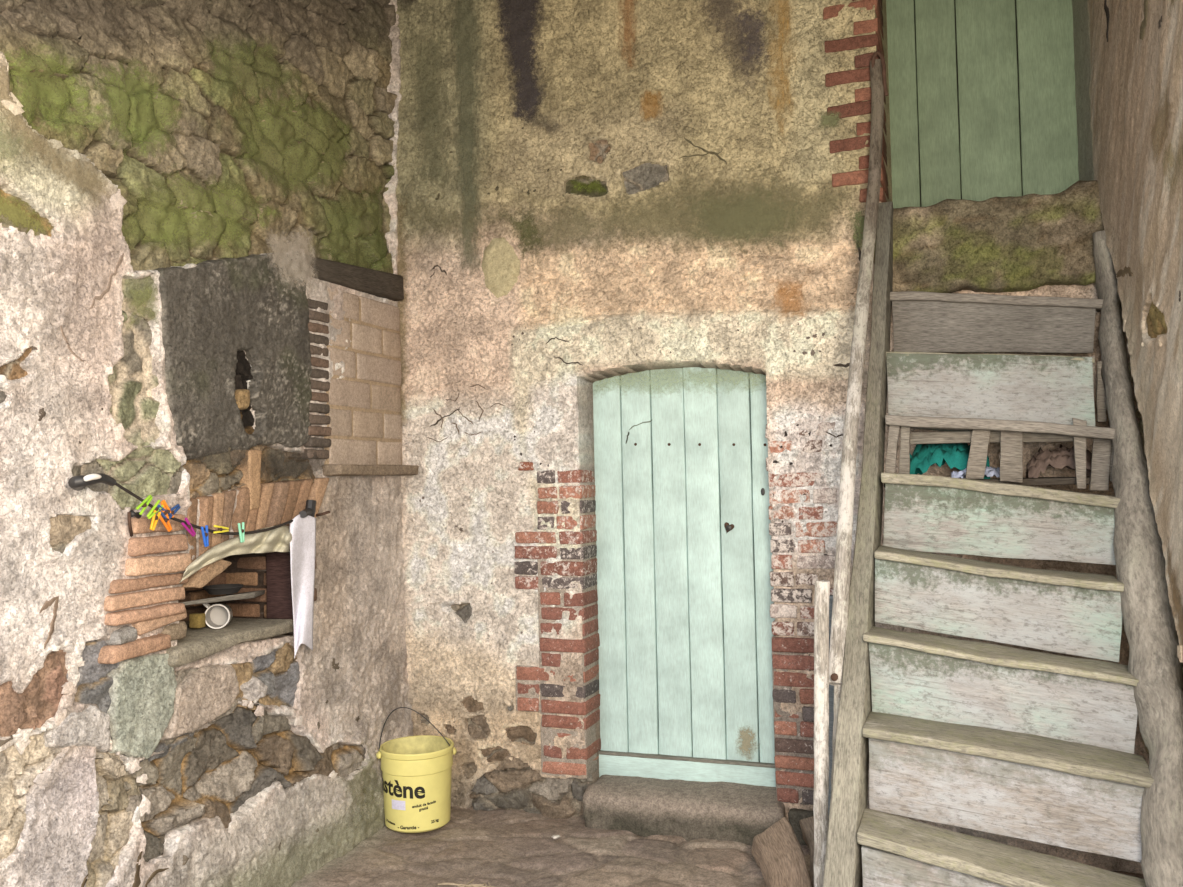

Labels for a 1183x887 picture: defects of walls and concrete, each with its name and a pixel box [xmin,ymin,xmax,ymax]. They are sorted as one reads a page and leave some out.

damp [496,0,546,120]
crack [1102,0,1110,42]
damp [454,0,478,263]
flaking render [0,0,412,518]
flaking render [1140,302,1167,347]
crack [426,384,504,442]
flaking render [1134,396,1147,460]
flaking render [49,515,92,553]
flaking render [412,435,601,819]
flaking render [765,416,837,805]
flaking render [0,639,366,887]